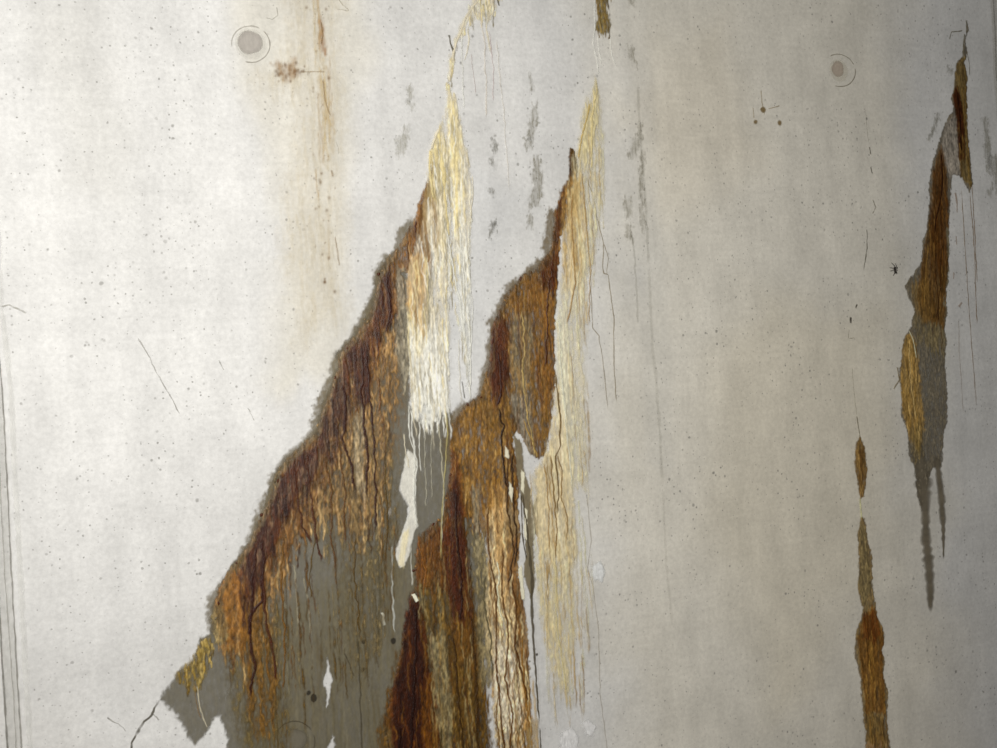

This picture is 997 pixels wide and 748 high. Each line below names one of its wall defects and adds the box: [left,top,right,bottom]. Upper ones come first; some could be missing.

rust [276,61,305,82]
rust [317,0,326,55]
rust [592,0,616,71]
crack [131,707,155,748]
rust [177,166,437,748]
rust [377,148,578,748]
rust [854,418,890,748]
rust [894,21,977,608]